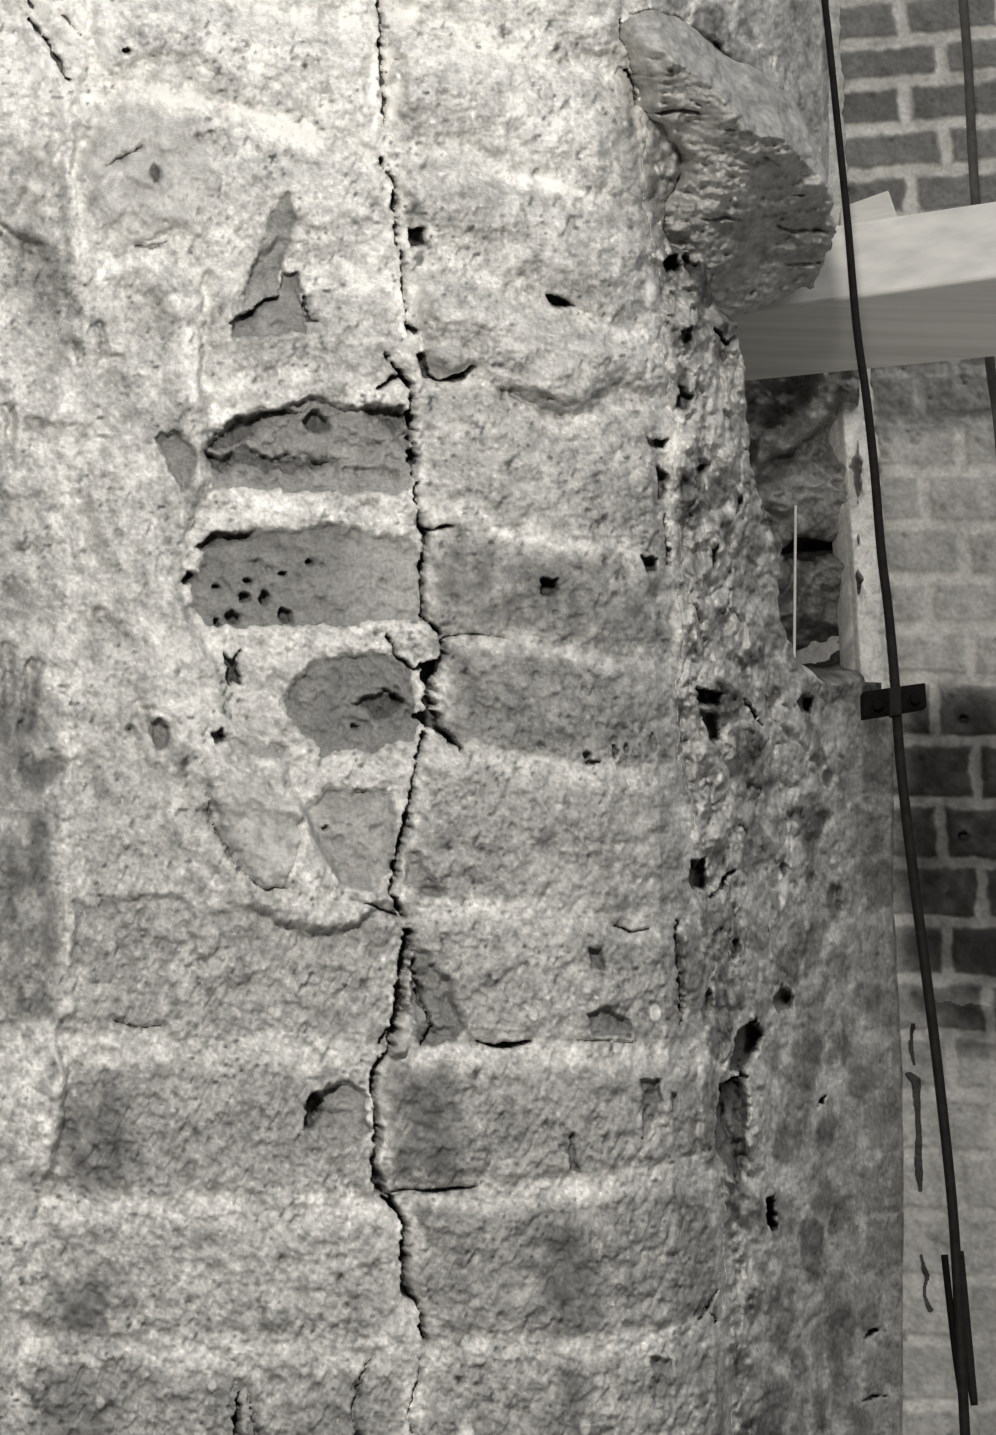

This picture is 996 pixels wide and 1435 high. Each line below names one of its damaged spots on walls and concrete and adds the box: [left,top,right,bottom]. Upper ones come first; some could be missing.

crack [27,0,72,81]
crack [375,0,386,121]
crack [379,156,407,331]
spalling [155,396,412,496]
spalling [181,522,422,629]
hole [781,537,833,561]
spalling [284,651,419,758]
hole [695,688,719,744]
crack [364,368,471,1434]
hole [714,1020,760,1192]
crack [231,1394,257,1435]
crack [351,1364,366,1435]